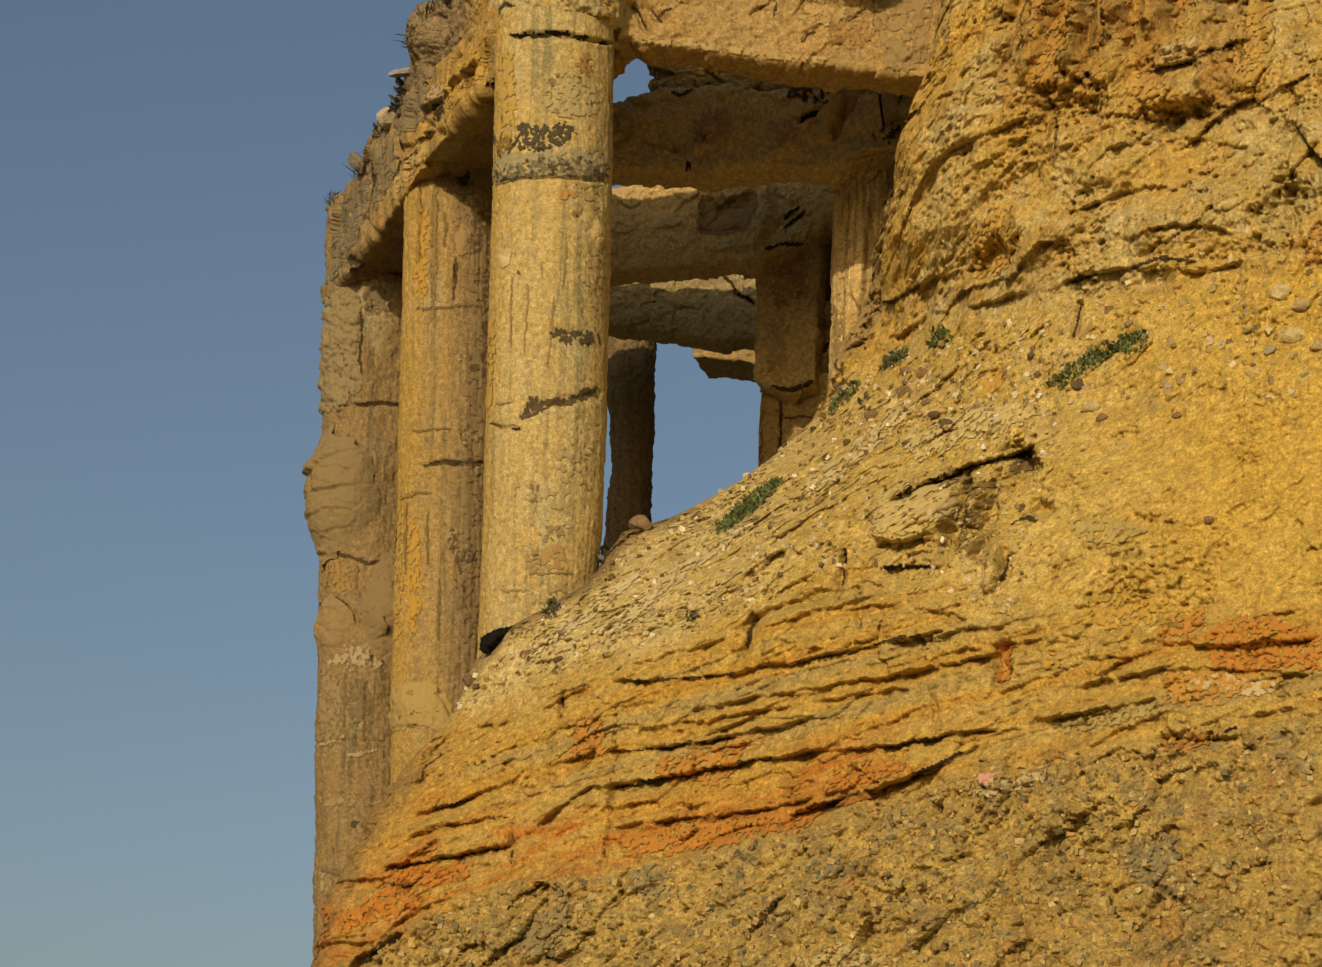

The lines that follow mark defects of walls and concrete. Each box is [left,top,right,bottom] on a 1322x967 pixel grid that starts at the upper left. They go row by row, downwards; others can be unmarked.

crack [498,1,609,45]
crack [632,5,672,29]
spalling [493,121,609,184]
spalling [694,188,758,236]